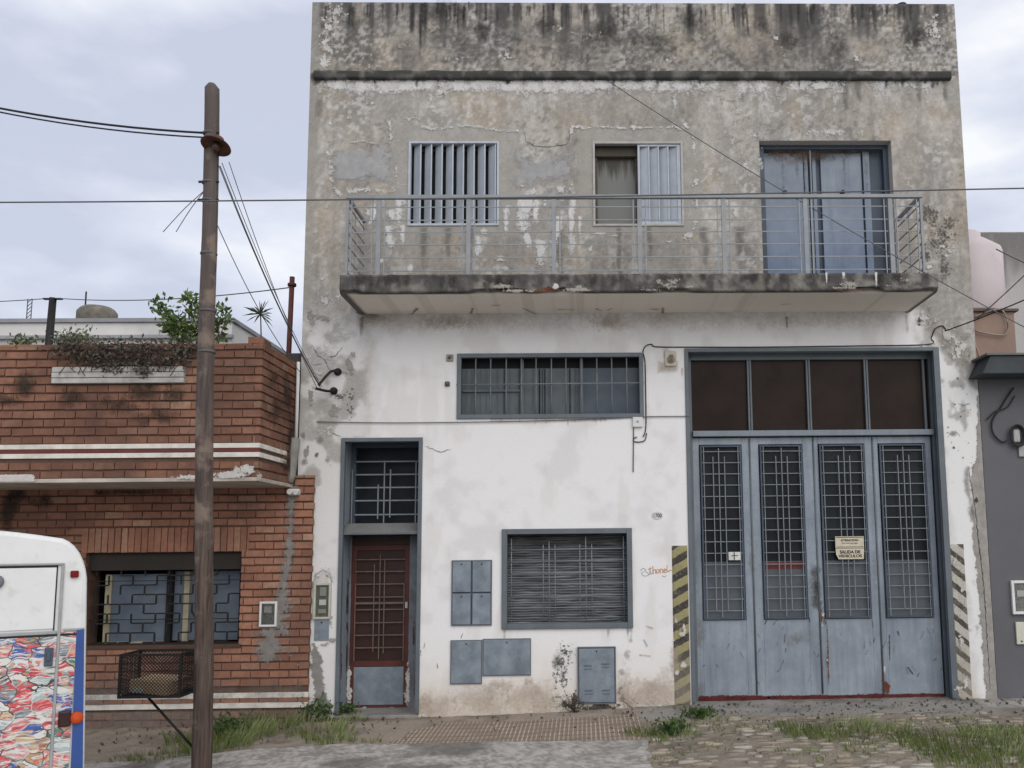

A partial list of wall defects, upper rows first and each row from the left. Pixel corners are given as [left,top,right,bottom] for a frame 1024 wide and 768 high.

leakage [396,2,469,44]
peeling [569,121,696,155]
peeling [503,150,618,268]
peeling [473,228,488,256]
spalling [213,464,263,480]
corrosion [813,572,830,678]
corrosion [699,635,944,701]